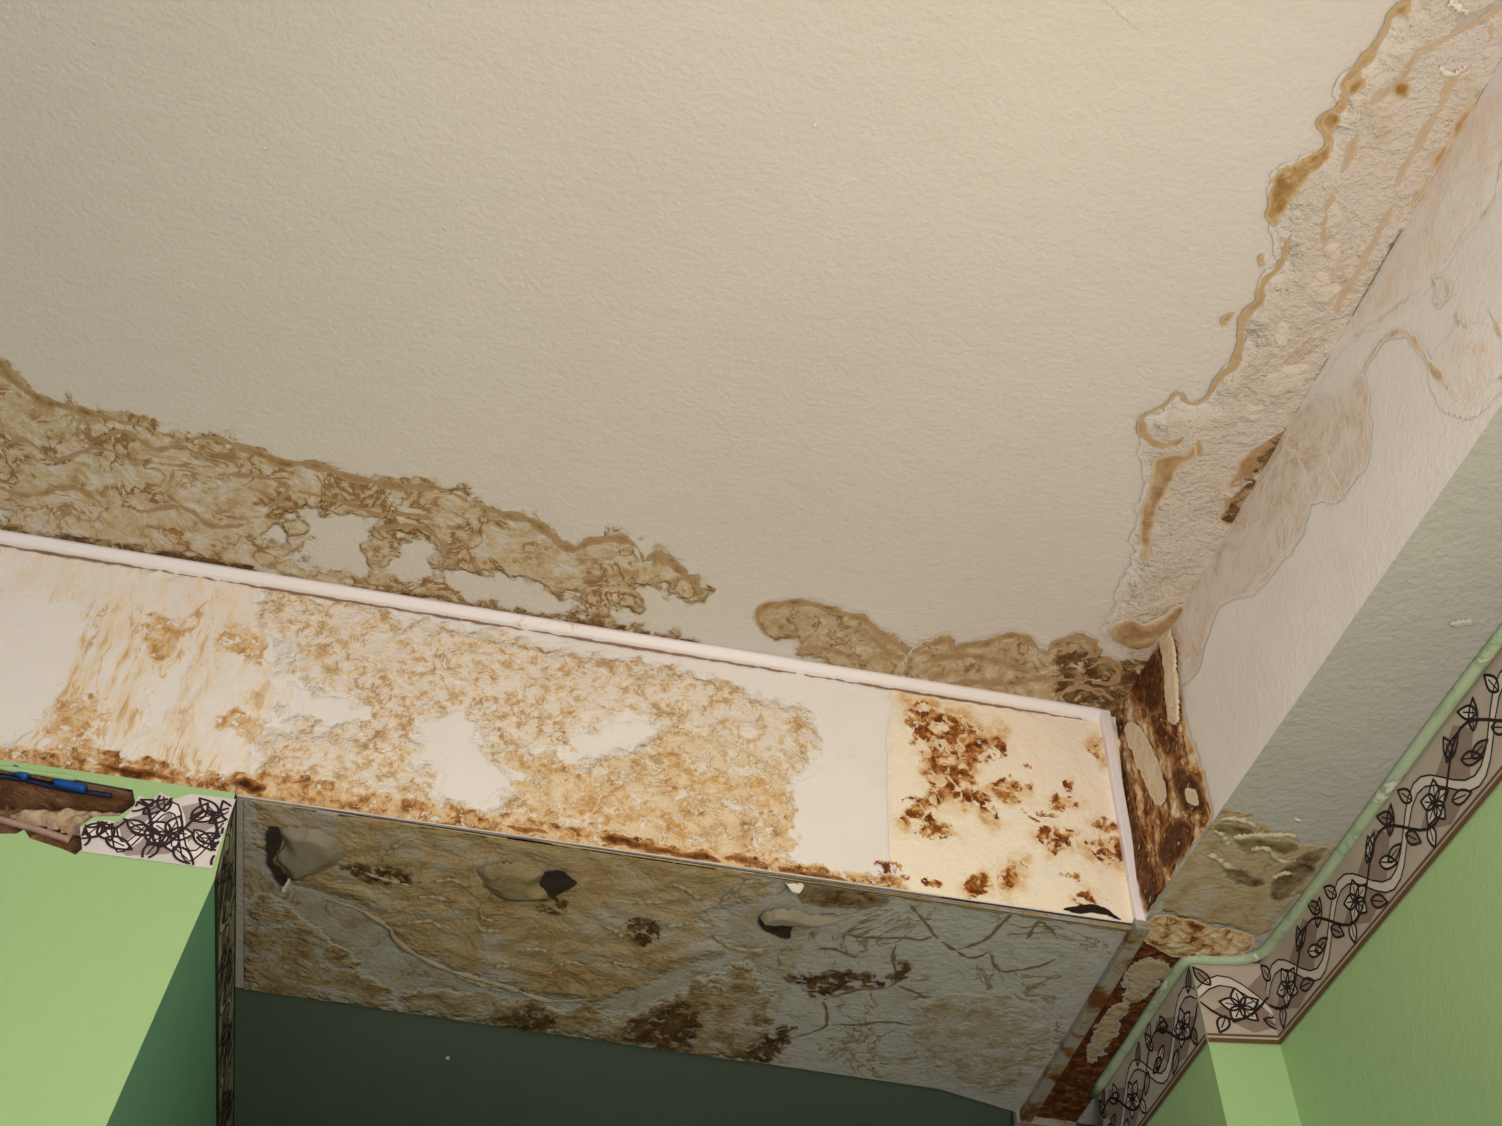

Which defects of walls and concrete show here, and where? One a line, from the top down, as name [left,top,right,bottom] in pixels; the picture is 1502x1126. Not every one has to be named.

peeling [1446,0,1502,37]
leakage [0,357,1132,1064]
flaking render [1108,604,1184,725]
flaking render [0,765,135,855]
peeling [759,882,1132,939]
peeling [1151,806,1337,936]
crack [756,873,1164,1103]
leakage [905,988,1057,1099]